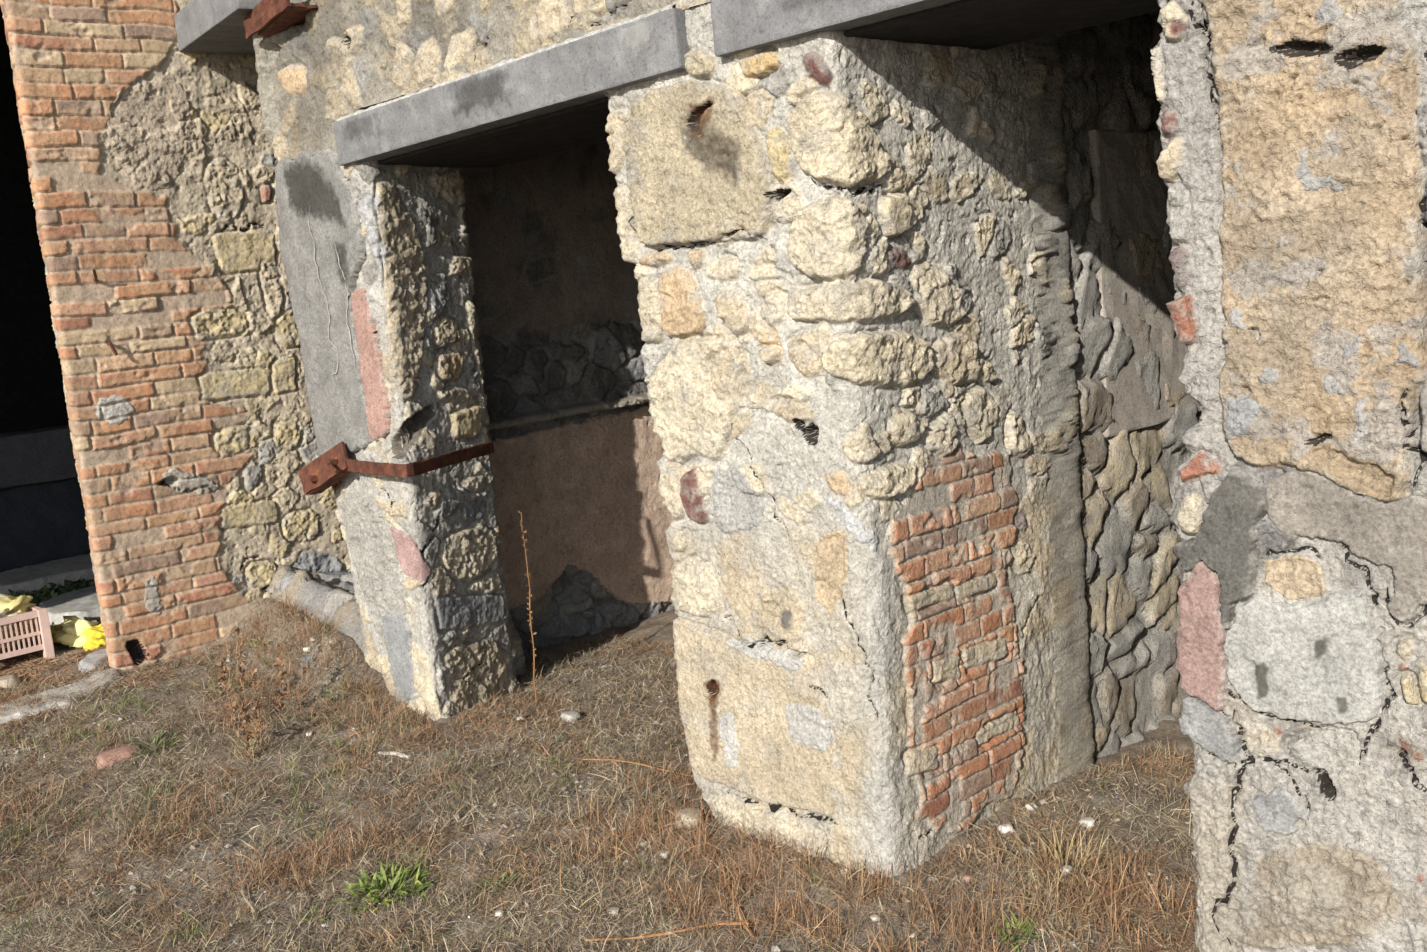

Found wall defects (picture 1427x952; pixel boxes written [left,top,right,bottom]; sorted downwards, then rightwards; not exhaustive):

crack [1257,542,1427,628]
crack [728,792,838,825]
crack [1205,663,1427,945]